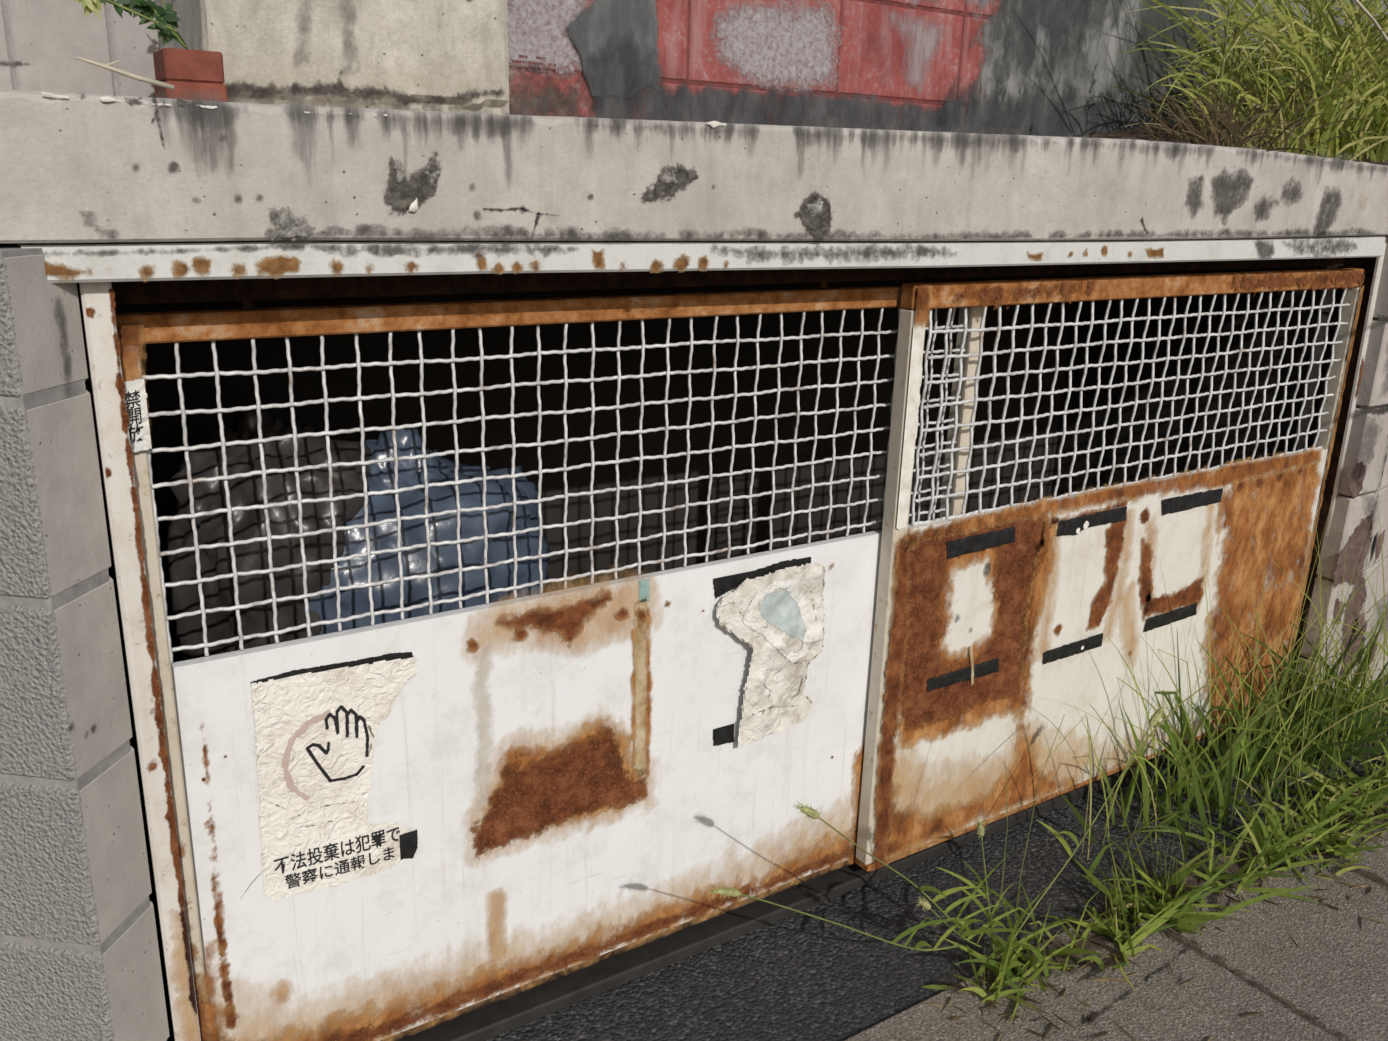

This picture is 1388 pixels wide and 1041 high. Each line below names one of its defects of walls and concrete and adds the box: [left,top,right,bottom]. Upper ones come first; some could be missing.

peeling [508,0,587,78]
leakage [454,43,662,151]
leakage [938,0,1198,156]
spalling [384,152,441,215]
spalling [641,163,714,203]
spalling [794,192,833,239]
leakage [1186,170,1301,221]
mould [1314,191,1342,235]
corrosion [44,262,91,281]
corrosion [172,256,211,278]
corrosion [232,255,300,278]
corrosion [86,270,1365,1041]